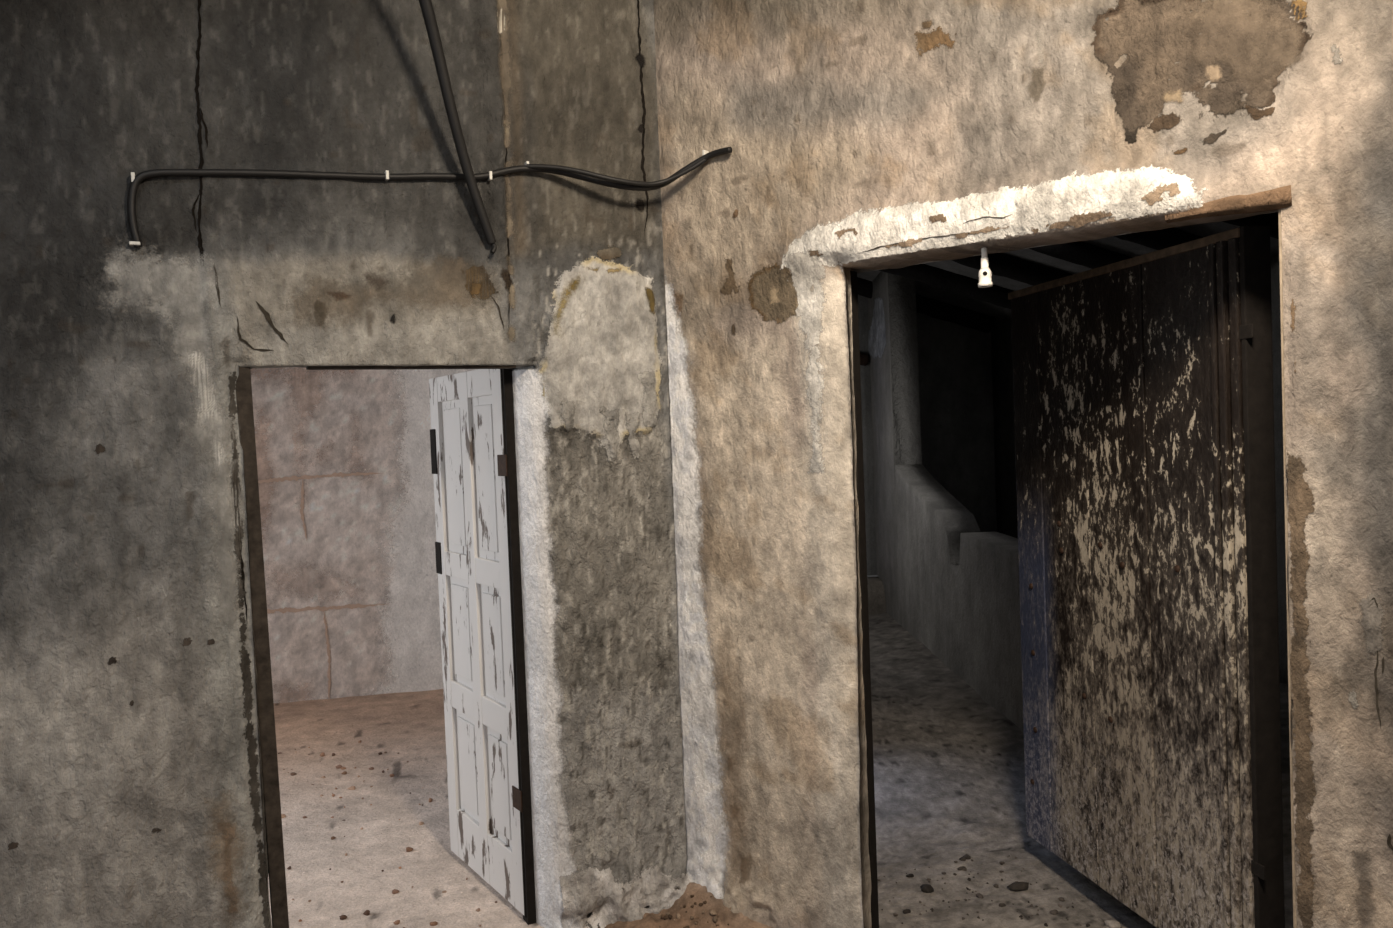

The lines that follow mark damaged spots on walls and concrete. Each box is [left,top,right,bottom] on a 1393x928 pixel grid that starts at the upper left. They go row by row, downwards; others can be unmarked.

peeling [914,20,956,56]
peeling [1090,0,1313,155]
crack [192,0,289,351]
peeling [1141,183,1181,205]
peeling [885,238,922,249]
peeling [929,214,947,223]
peeling [955,226,1009,239]
peeling [1031,211,1113,234]
spalling [720,259,799,324]
spalling [672,292,683,315]
crack [1355,834,1393,926]